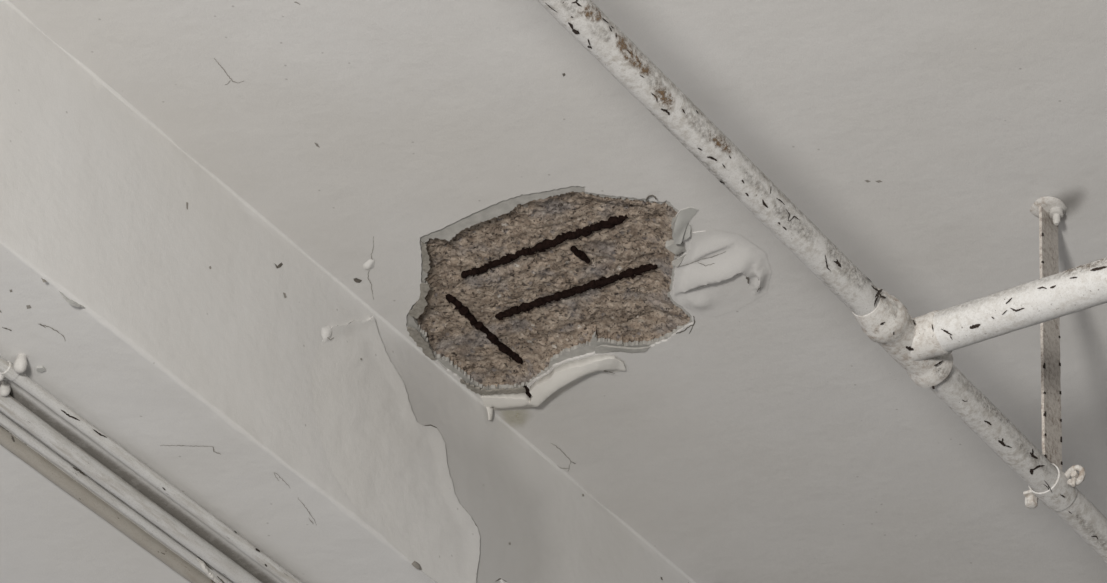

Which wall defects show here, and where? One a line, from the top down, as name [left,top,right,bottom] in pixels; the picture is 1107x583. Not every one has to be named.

spalling [406,186,699,420]
peeling [312,316,480,583]